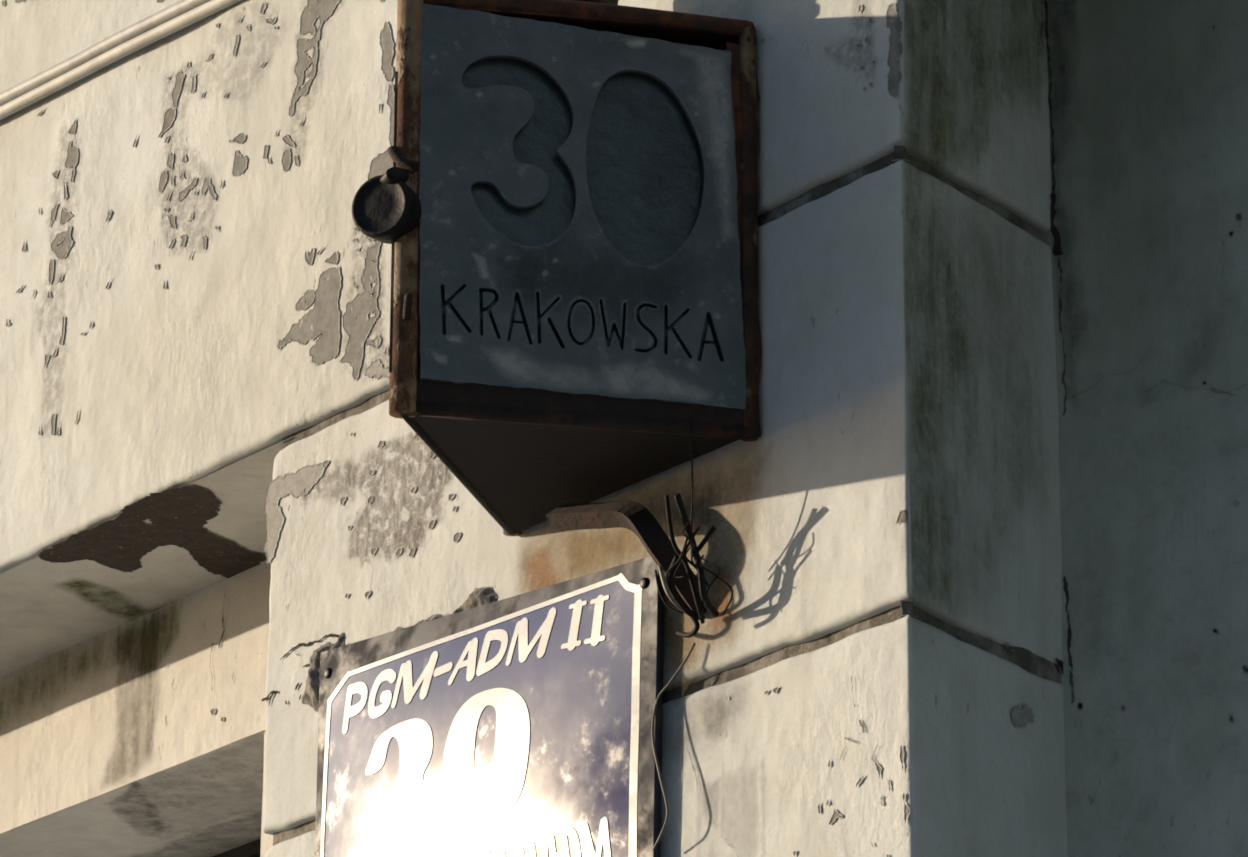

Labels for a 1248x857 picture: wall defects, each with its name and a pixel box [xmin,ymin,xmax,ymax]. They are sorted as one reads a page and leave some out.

peeling [16,119,79,299]
peeling [158,62,247,260]
peeling [263,130,299,172]
peeling [289,0,339,126]
peeling [368,21,394,180]
crack [1044,0,1067,415]
peeling [277,227,390,380]
peeling [38,460,329,578]
damp [66,582,172,669]
flaking render [302,633,351,712]
flaking render [392,587,497,632]
crack [1063,576,1075,704]